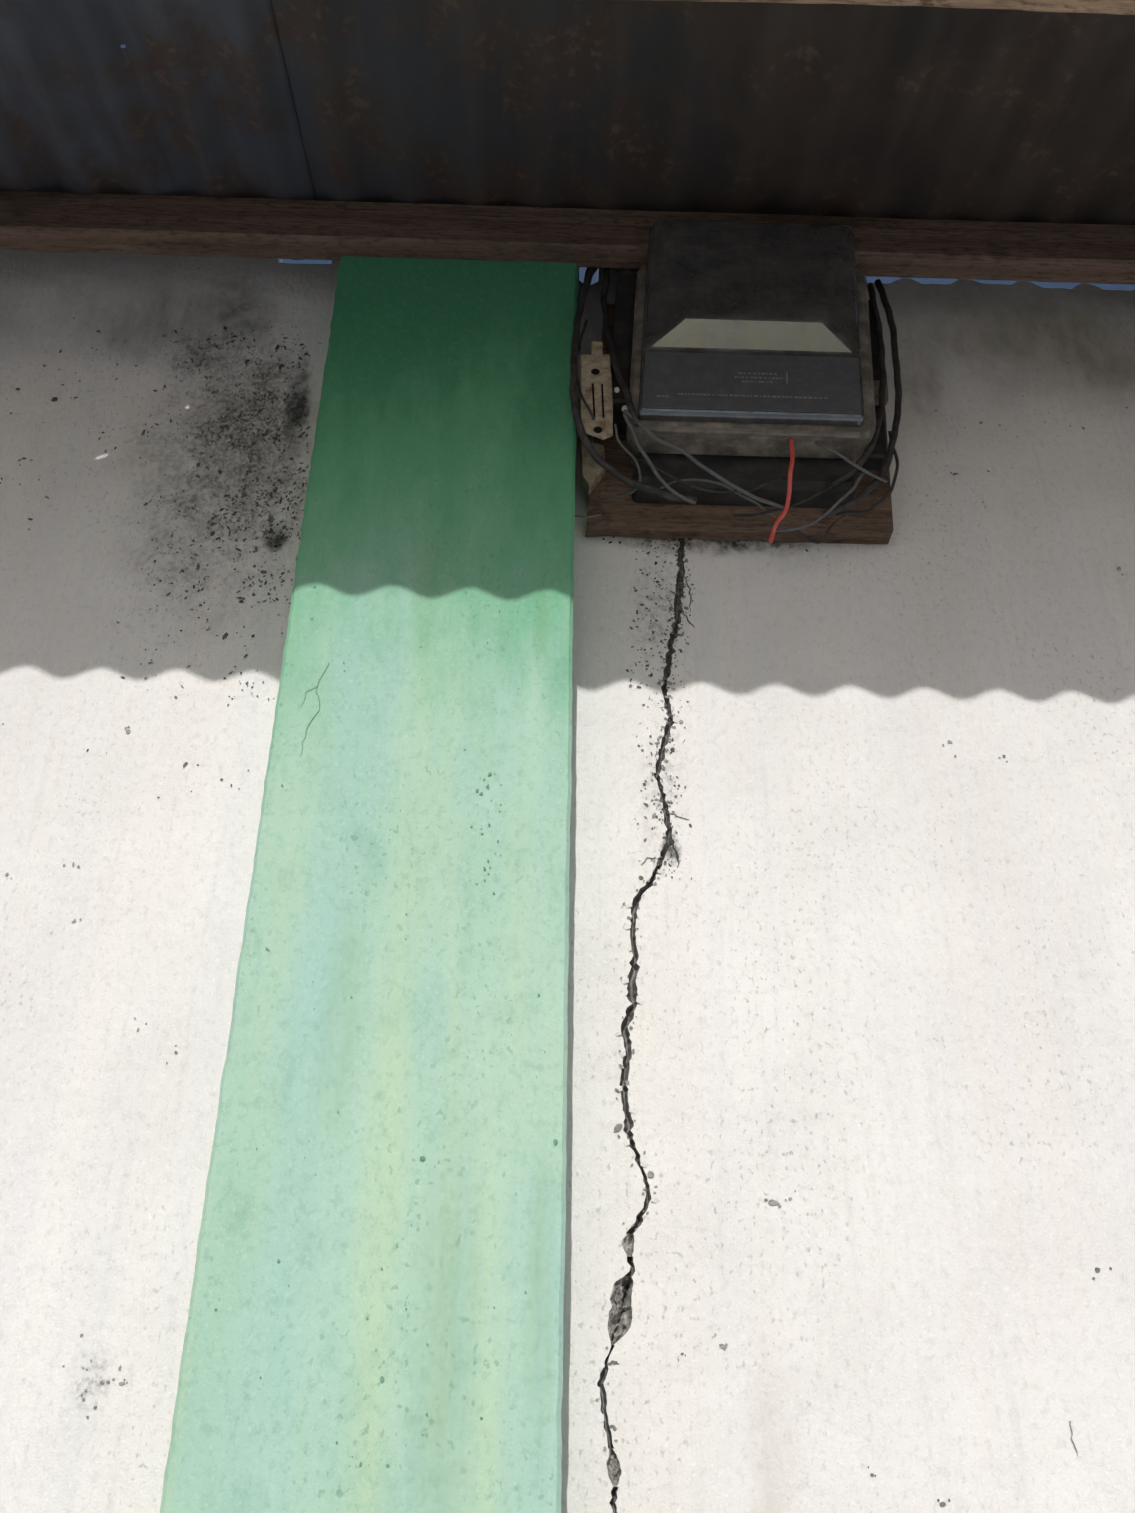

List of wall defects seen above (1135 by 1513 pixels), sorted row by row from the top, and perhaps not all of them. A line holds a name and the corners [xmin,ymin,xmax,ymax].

water stain [115,325,321,706]
crack [614,538,694,1276]
crack [590,1345,619,1451]
crack [609,1487,623,1513]